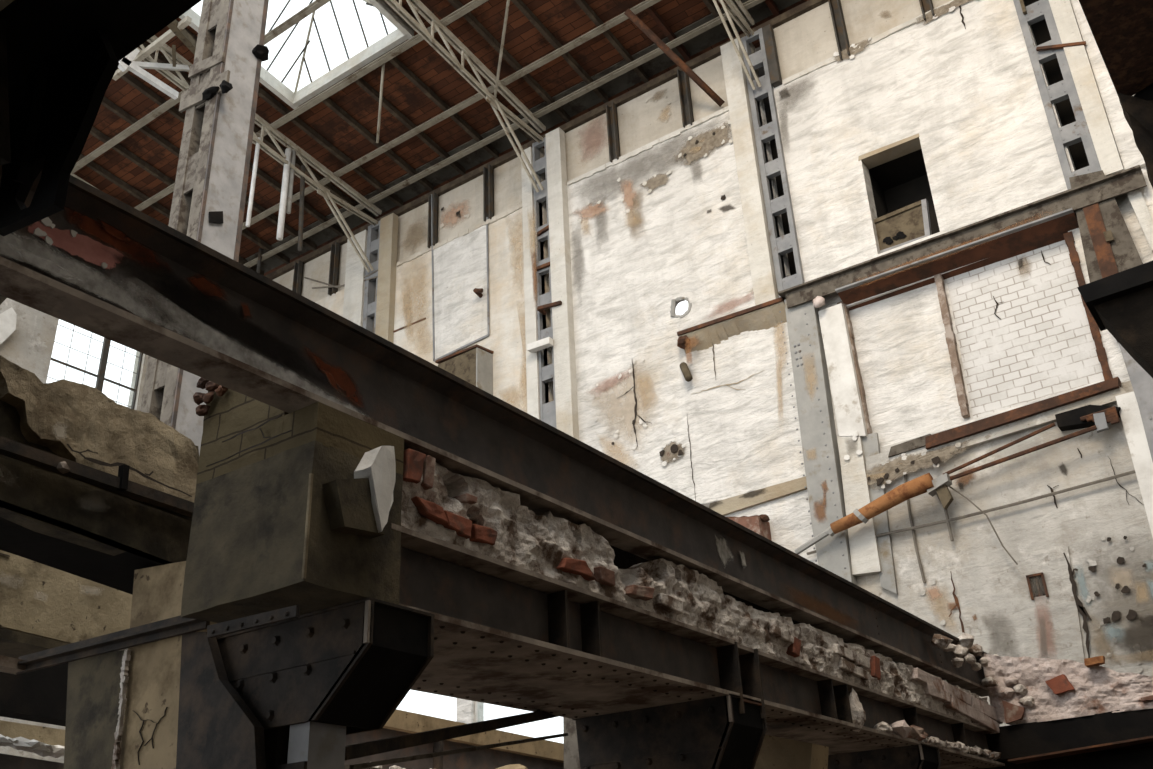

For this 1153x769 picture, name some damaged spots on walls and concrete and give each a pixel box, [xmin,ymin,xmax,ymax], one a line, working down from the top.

flaking render [617,120,733,213]
corrosion [68,207,168,270]
crack [618,362,652,447]
spalling [659,438,685,466]
spalling [866,434,967,489]
spalling [401,449,1003,734]
crack [1063,552,1092,658]
peeling [1078,536,1153,657]
damp [1124,616,1153,660]
spalling [111,650,131,769]
crack [132,707,168,765]